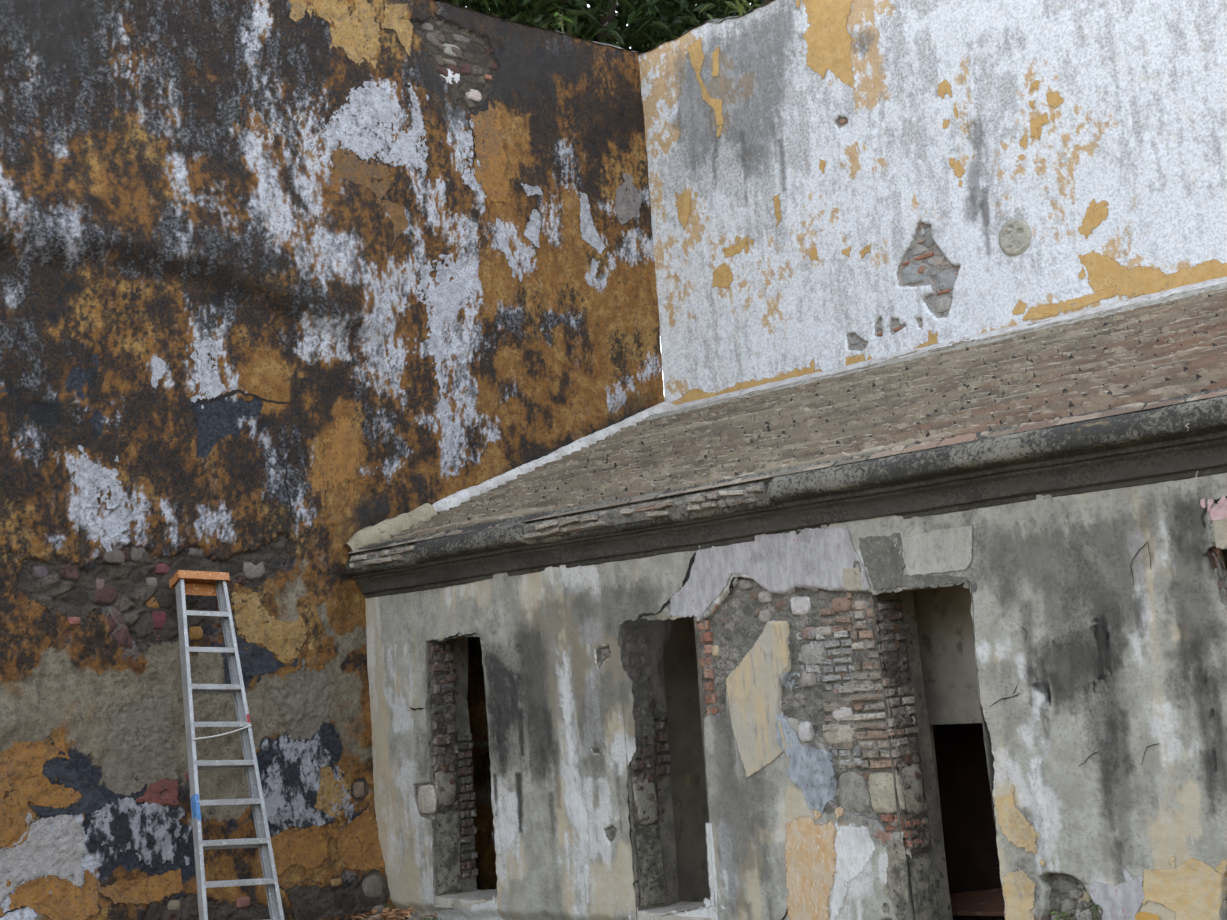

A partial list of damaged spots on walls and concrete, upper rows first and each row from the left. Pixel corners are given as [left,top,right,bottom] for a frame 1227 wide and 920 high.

peeling [796,0,855,91]
peeling [288,0,543,282]
peeling [579,191,606,277]
flaking render [842,223,960,365]
peeling [1012,198,1227,321]
crack [196,389,292,404]
crack [637,550,697,620]
peeling [1200,495,1227,605]
flaking render [0,445,390,920]
flaking render [670,525,976,920]
water stain [1027,690,1052,878]
peeling [994,785,1227,920]